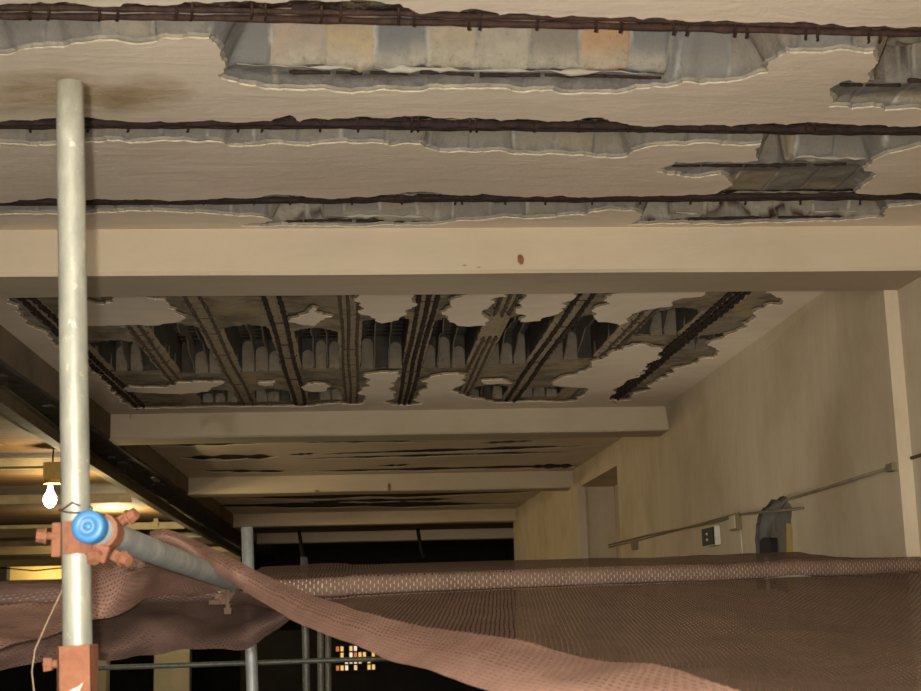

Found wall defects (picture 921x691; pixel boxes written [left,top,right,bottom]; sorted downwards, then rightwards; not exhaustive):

rust [0,2,921,44]
flaking render [0,0,921,109]
rust [0,118,56,133]
flaking render [0,129,57,145]
rust [84,116,921,136]
flaking render [84,116,921,226]
rust [0,198,57,206]
flaking render [0,206,57,214]
rust [86,191,921,205]
spalling [7,298,59,346]
flaking render [88,293,612,410]
flaking render [550,291,783,403]